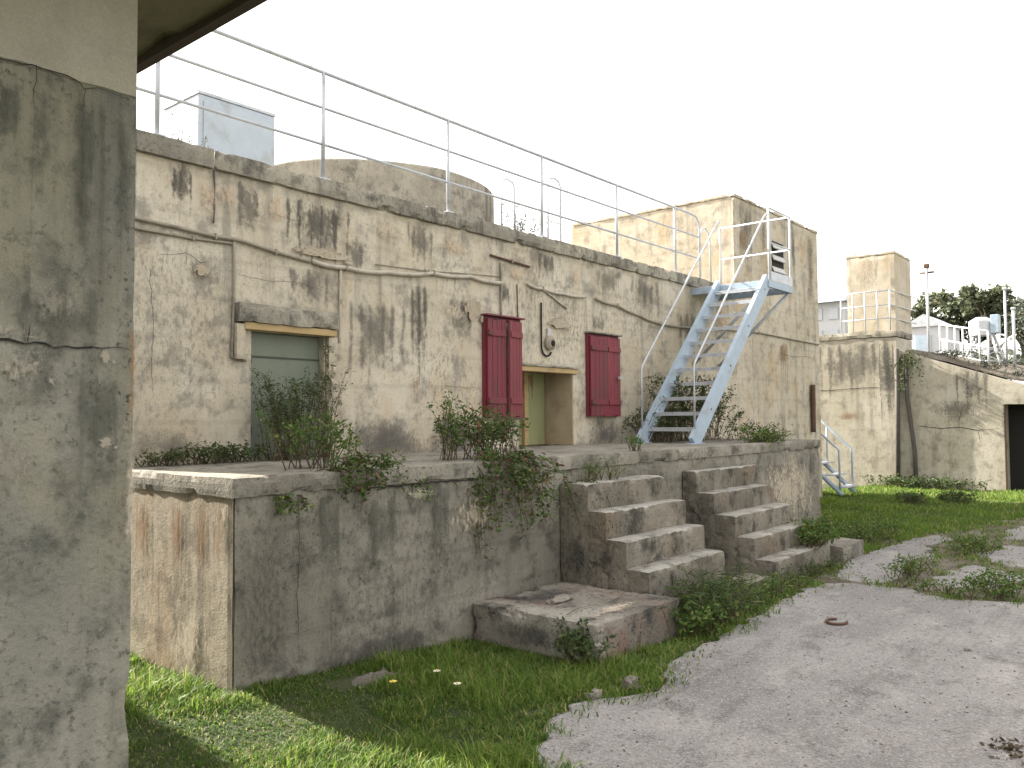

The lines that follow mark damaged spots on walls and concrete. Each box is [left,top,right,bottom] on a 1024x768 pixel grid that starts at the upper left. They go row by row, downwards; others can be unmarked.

crack [0,58,132,109]
leakage [172,164,192,198]
leakage [287,199,364,268]
crack [0,253,203,396]
leakage [350,287,427,374]
leakage [810,341,895,412]